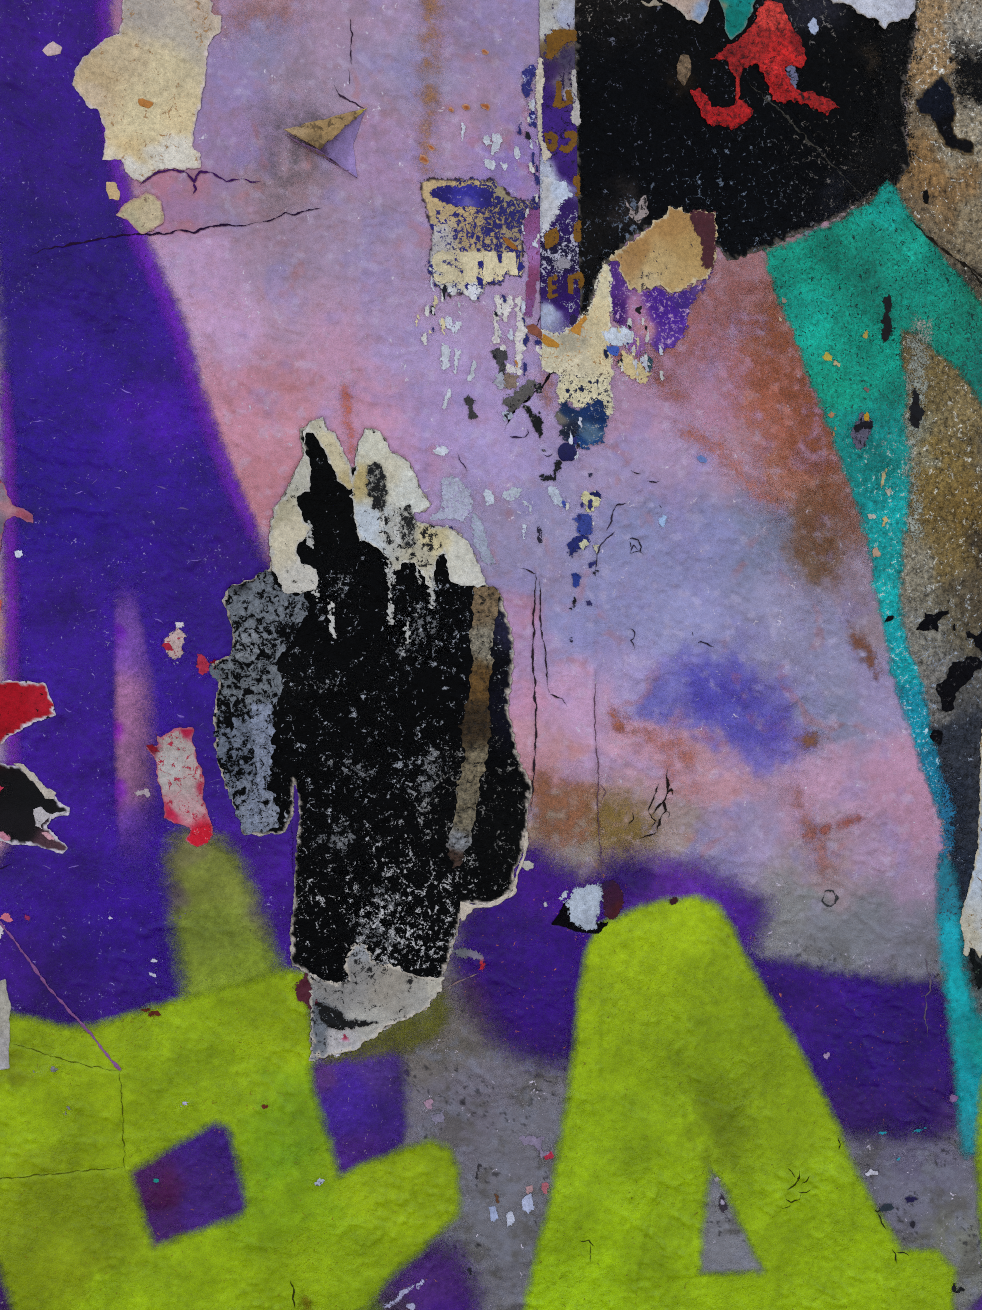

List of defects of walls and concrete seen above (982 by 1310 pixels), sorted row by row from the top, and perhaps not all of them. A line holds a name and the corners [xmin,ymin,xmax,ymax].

peeling [72,0,222,234]
crack [139,169,259,194]
crack [34,208,320,254]
peeling [625,195,649,224]
peeling [617,318,664,382]
peeling [134,727,213,847]
peeling [544,880,624,934]
peeling [452,946,485,970]